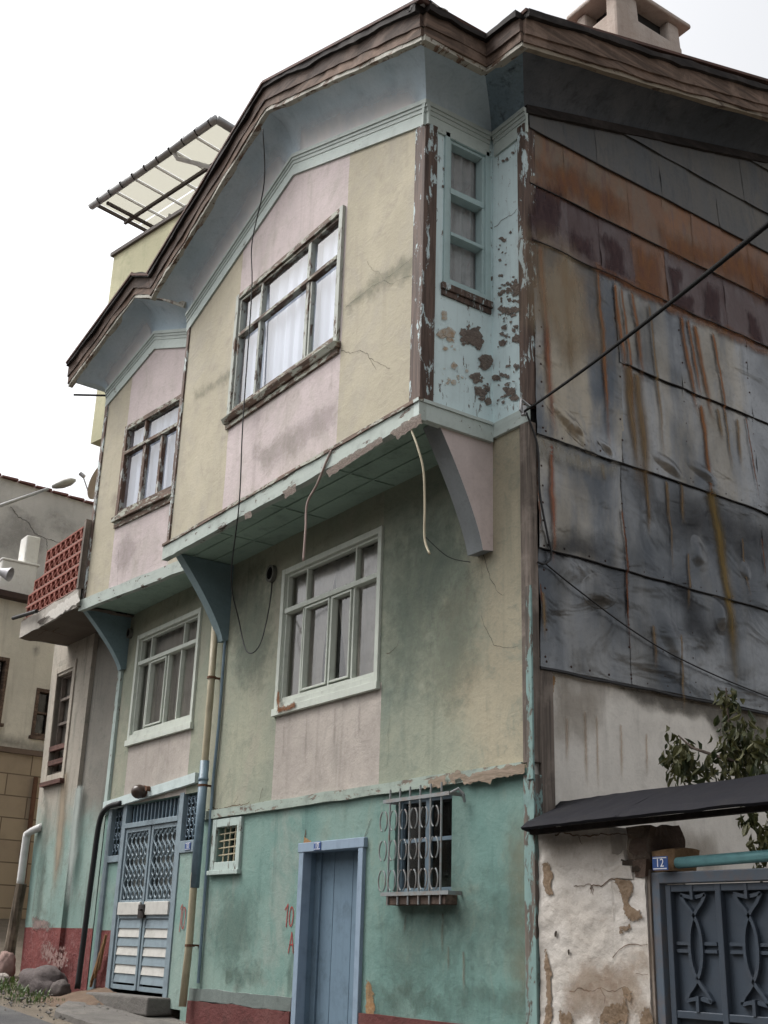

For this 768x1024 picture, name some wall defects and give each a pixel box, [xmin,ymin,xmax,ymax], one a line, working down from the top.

peeling [436,227,519,405]
corrosion [530,184,562,403]
peeling [326,414,422,477]
corrosion [571,230,766,650]
peeling [423,764,525,789]
flaking render [542,862,553,896]
flaking render [614,859,643,934]
flaking render [544,948,574,1024]
flaking render [598,987,653,1024]